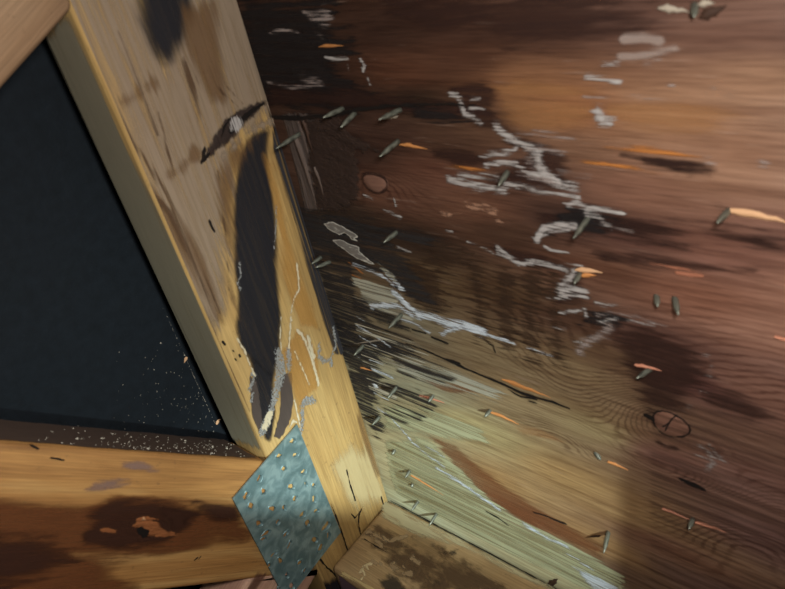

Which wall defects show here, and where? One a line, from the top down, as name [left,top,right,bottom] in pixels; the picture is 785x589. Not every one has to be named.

leakage [142,0,229,103]
crack [200,101,476,164]
leakage [123,121,220,312]
leakage [208,0,770,589]
crack [406,329,570,409]
leakage [0,496,249,589]